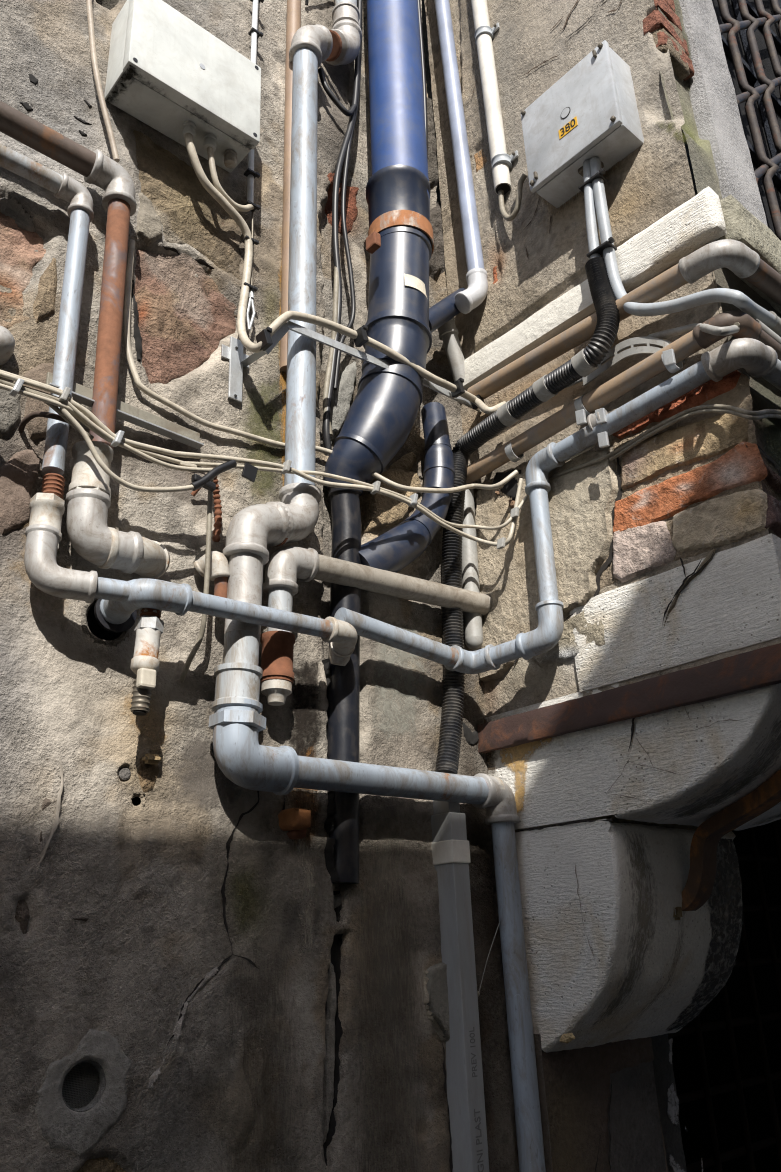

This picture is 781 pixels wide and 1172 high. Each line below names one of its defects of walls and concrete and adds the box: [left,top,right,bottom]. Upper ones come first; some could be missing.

crack [662,548,717,626]
crack [167,791,285,1045]
crack [323,891,343,1166]